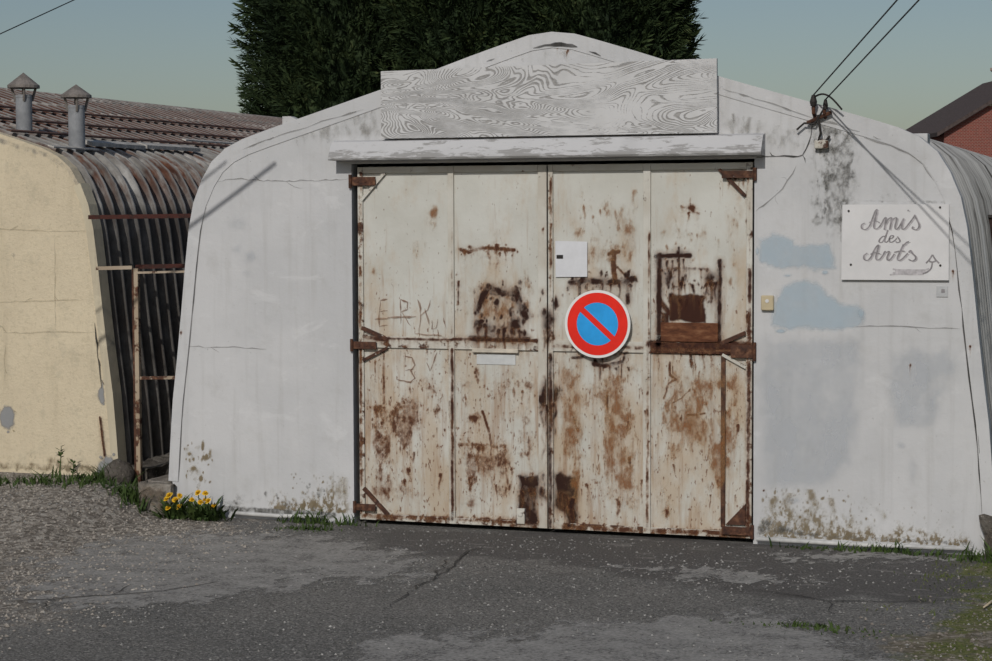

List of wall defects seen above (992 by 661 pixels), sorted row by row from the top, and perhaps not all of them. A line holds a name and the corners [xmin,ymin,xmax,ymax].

water stain [817,130,853,223]
peeling [756,236,832,274]
peeling [774,282,863,332]
rust [359,233,752,537]
spalling [0,407,15,433]
water stain [760,490,967,546]